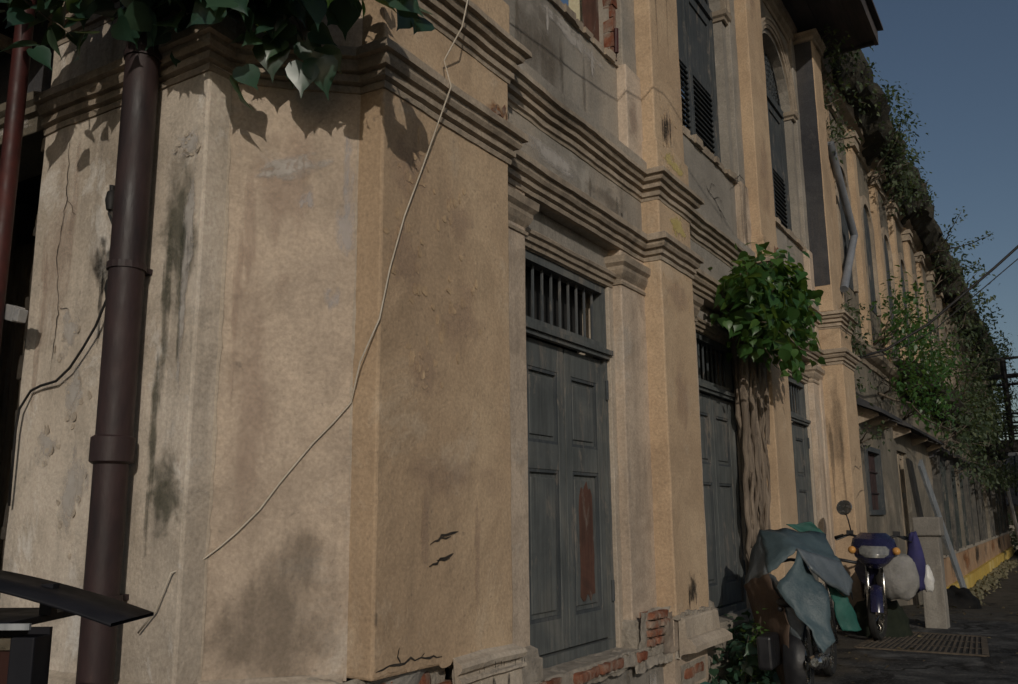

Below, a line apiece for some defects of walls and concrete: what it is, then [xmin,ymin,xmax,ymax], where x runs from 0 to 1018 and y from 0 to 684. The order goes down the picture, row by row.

crack [50,135,76,368]
damp [94,239,110,338]
damp [162,184,195,376]
damp [147,325,176,521]
spalling [307,658,455,684]
spalling [530,606,712,684]